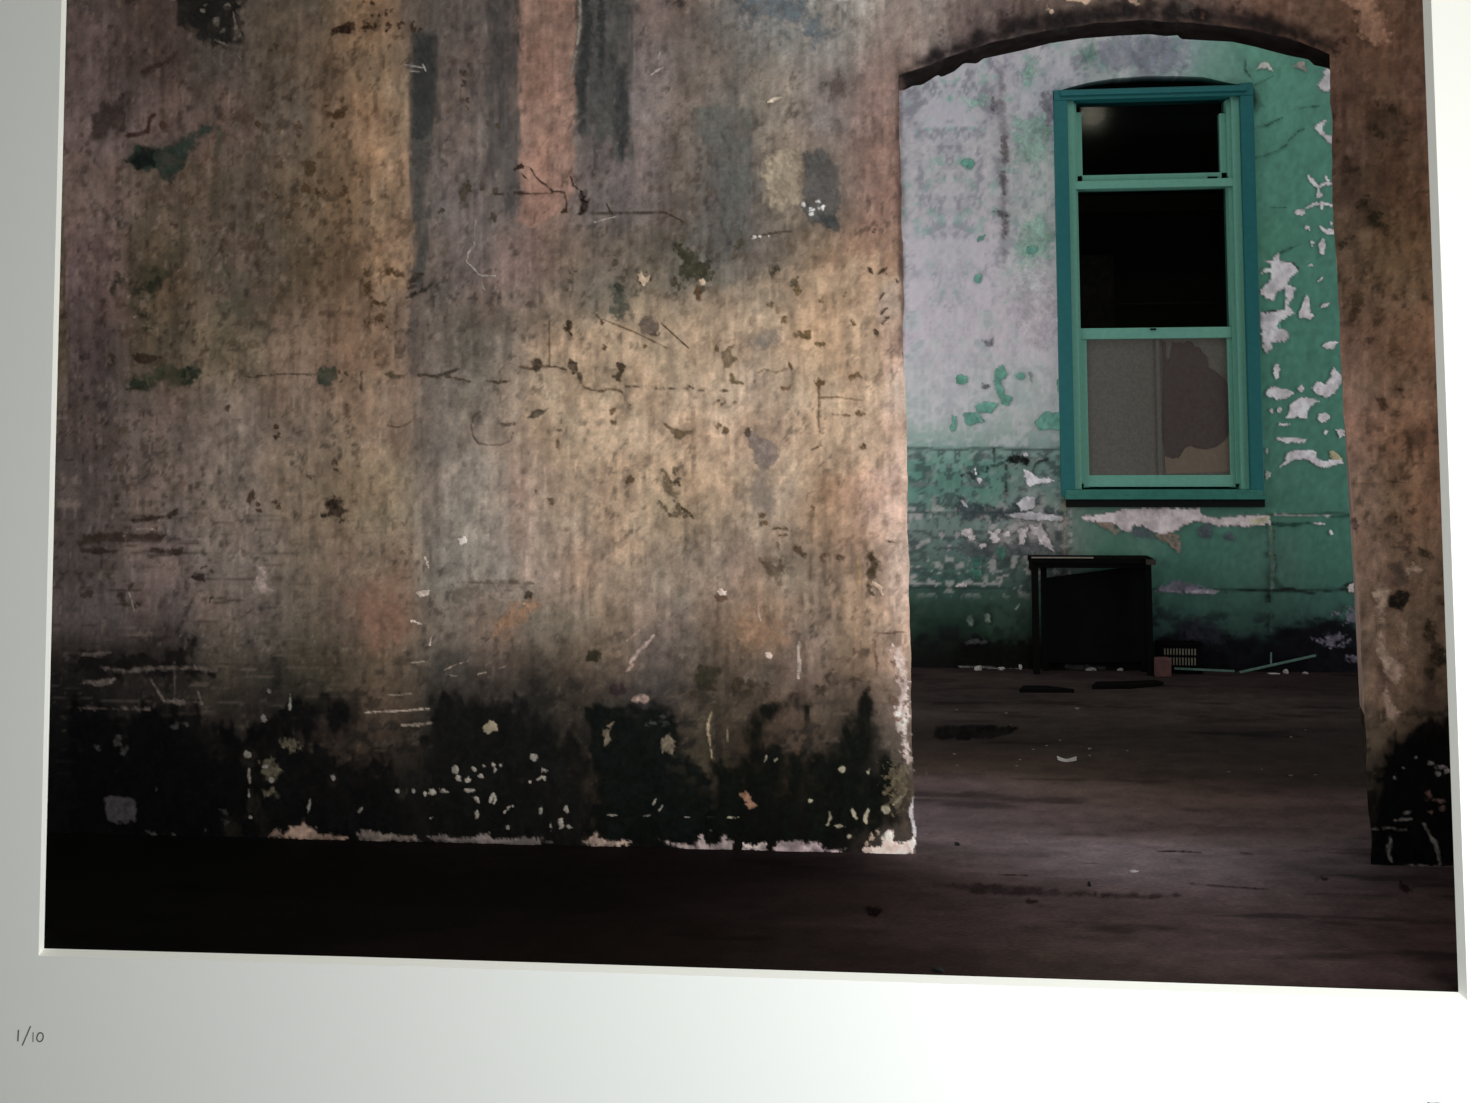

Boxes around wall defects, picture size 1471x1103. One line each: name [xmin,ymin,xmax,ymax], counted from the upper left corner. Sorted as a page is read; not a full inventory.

leakage [174,0,243,71]
leakage [570,0,633,164]
peeling [1294,61,1330,91]
peeling [1315,120,1332,144]
leakage [386,31,445,378]
peeling [1260,175,1345,480]
peeling [950,402,998,432]
peeling [1035,411,1060,431]
flaking render [955,495,1359,587]
leakage [1163,609,1358,673]
leakage [69,636,909,849]
leakage [1372,716,1454,892]